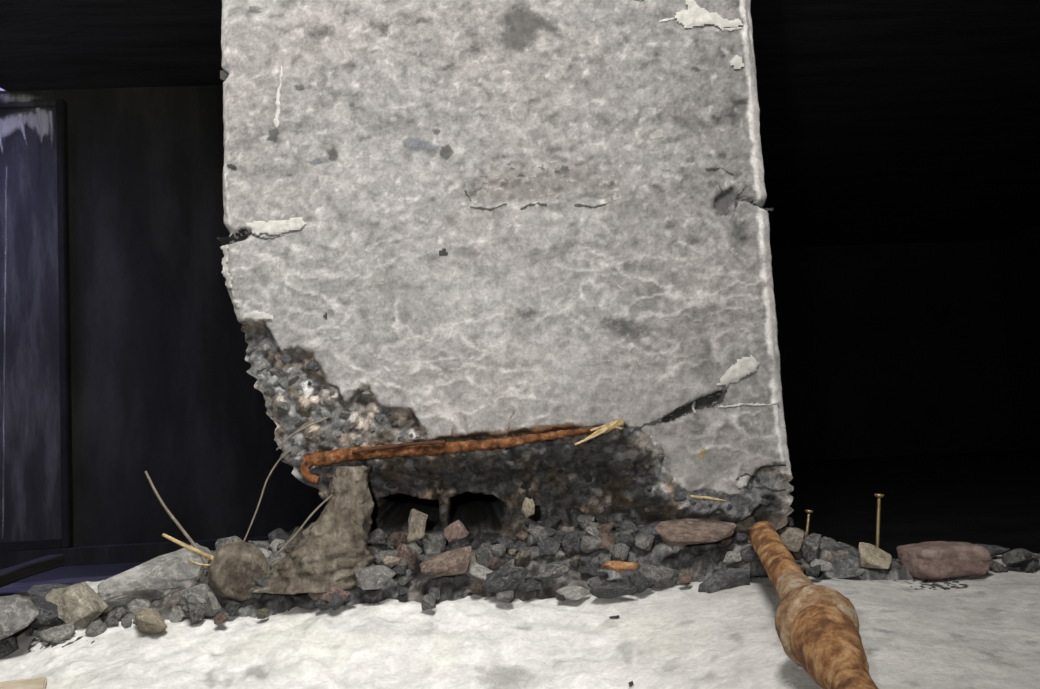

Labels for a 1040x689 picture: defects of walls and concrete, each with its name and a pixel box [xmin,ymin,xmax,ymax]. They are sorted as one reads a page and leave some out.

rust [352,413,579,453]
spalling [217,217,794,550]